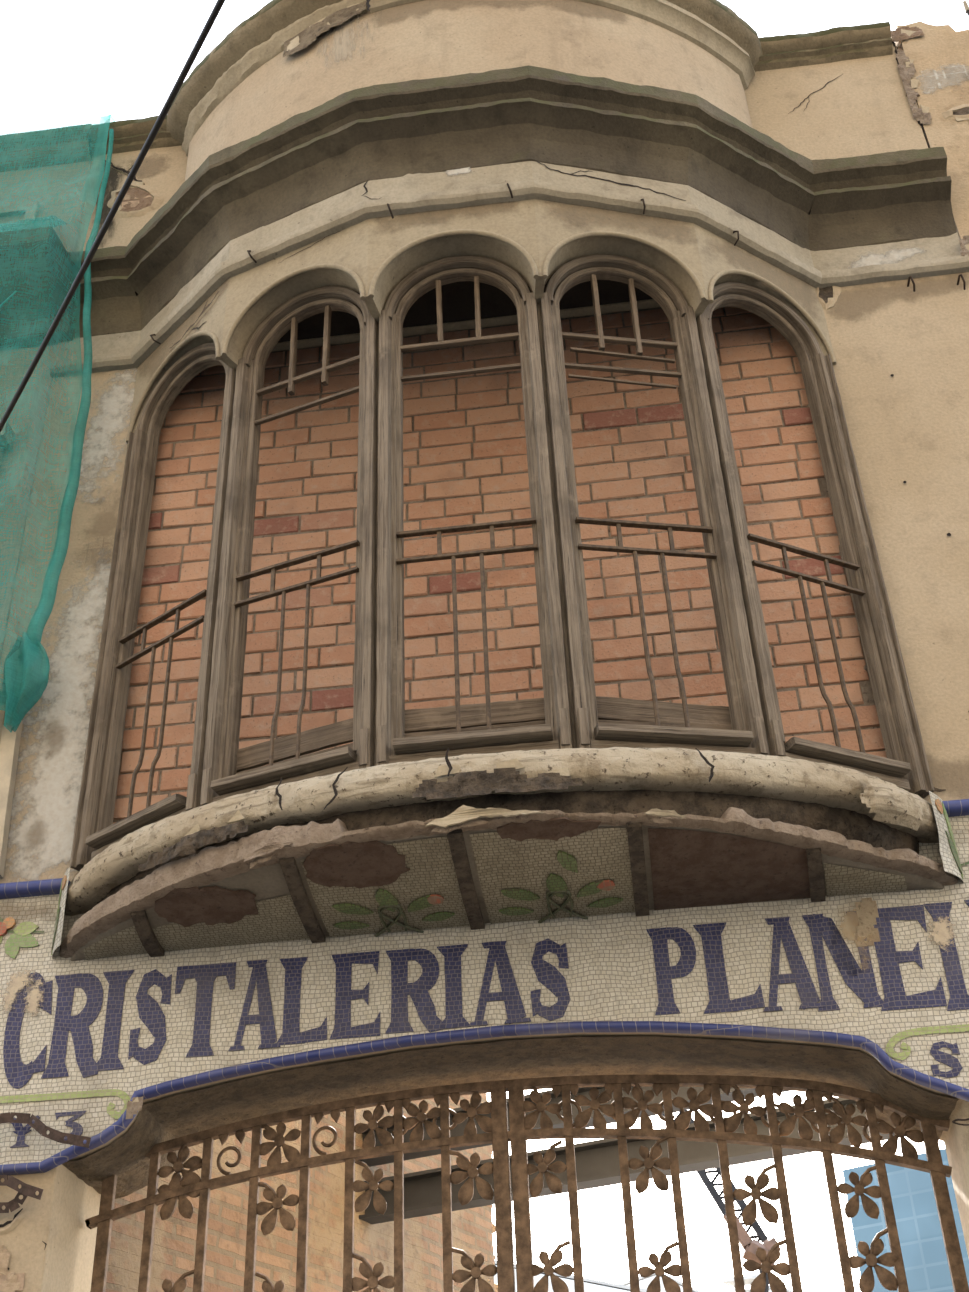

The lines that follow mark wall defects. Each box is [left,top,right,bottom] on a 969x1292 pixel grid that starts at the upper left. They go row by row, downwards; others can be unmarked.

crack [788,74,843,114]
spalling [891,26,969,124]
spalling [107,181,164,218]
spalling [60,758,958,958]
peeling [1,970,44,1016]